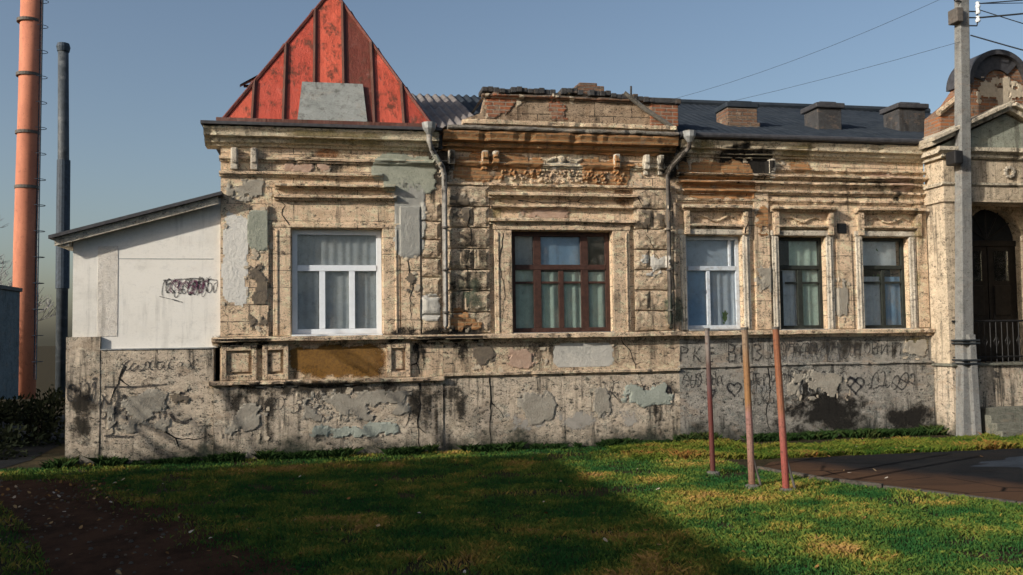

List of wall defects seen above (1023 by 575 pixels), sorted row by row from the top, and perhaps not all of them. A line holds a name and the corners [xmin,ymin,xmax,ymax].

peeling [976,76,1023,108]
flaking render [676,158,770,237]
flaking render [244,243,273,332]
leakage [70,389,98,444]
leakage [231,380,397,441]
leakage [409,384,467,433]
leakage [801,381,840,412]